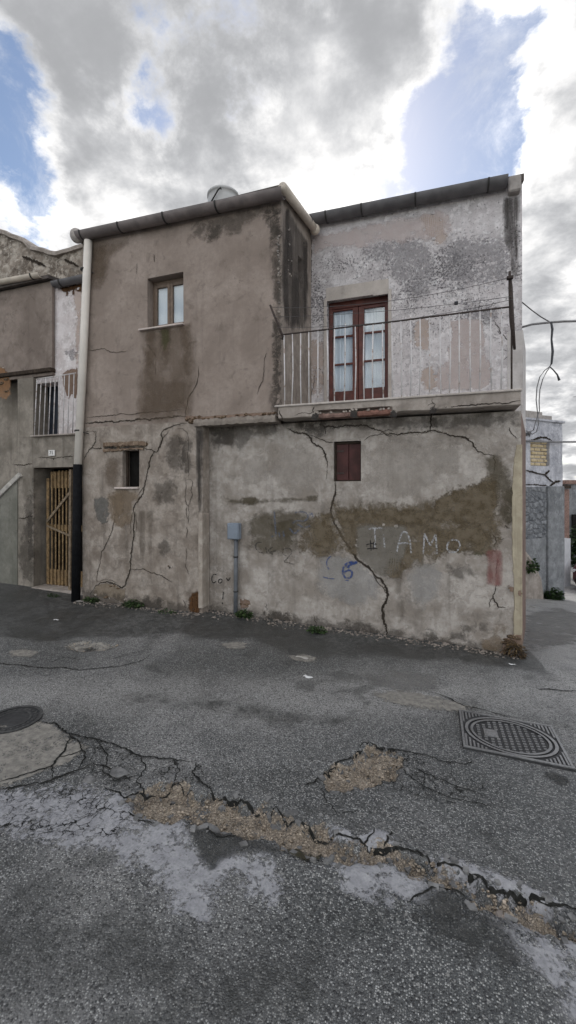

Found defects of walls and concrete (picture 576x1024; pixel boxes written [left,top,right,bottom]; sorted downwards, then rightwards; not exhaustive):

crack [15,366,199,603]
peeling [355,523,408,579]
crack [279,369,552,635]
crack [0,735,216,837]
crack [379,753,501,804]